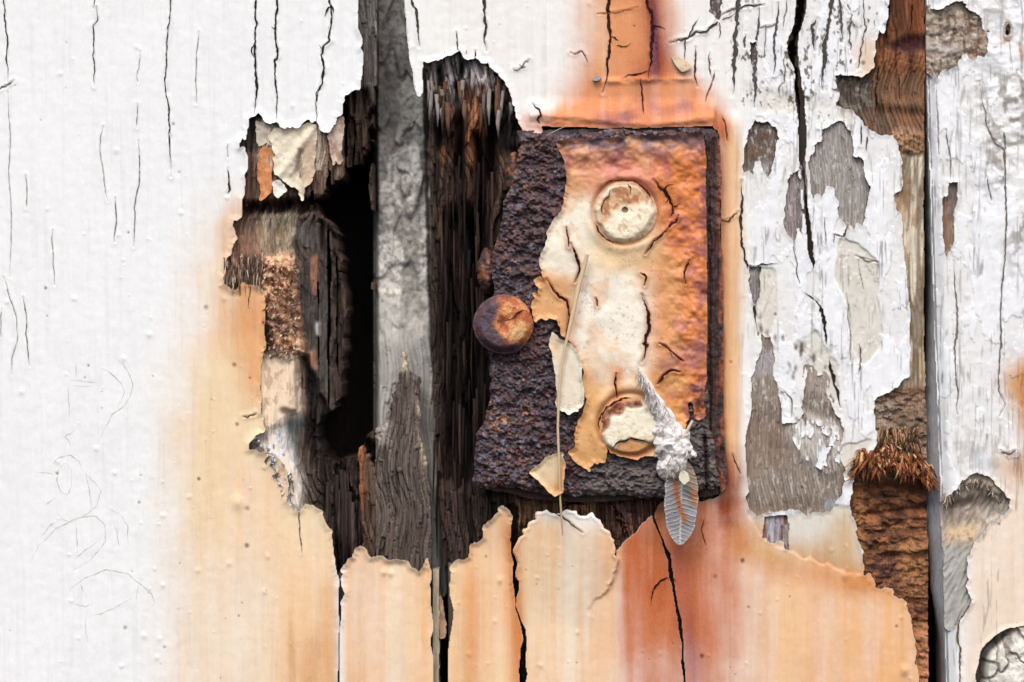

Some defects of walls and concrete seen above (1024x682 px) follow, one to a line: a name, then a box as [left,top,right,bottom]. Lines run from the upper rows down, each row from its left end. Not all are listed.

crack [0,0,27,218]
crack [163,0,171,161]
crack [251,0,279,118]
peeling [255,116,345,201]
crack [315,0,334,120]
crack [572,0,913,149]
spalling [317,155,374,458]
rust [517,127,731,497]
peeling [742,0,1010,682]
peeling [253,437,295,506]
rust [479,486,665,502]
crack [650,523,686,682]